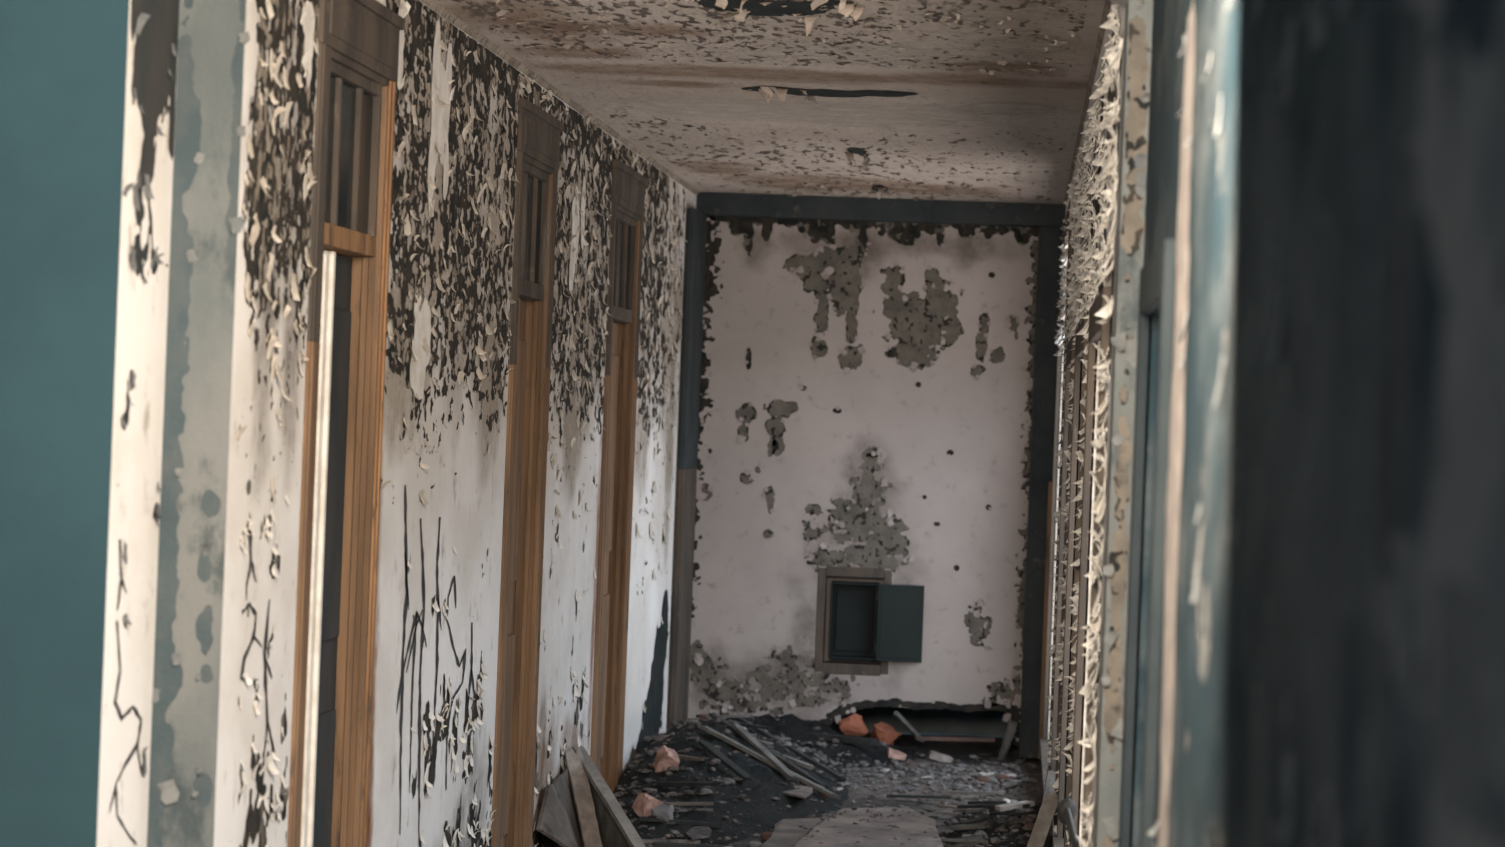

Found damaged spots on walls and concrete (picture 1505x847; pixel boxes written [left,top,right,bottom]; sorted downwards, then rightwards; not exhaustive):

crack [109,539,142,845]
peeling [121,0,213,847]
peeling [201,490,221,517]
crack [240,530,275,763]
peeling [231,673,289,847]
peeling [225,0,320,585]
crack [396,485,475,846]
peeling [384,0,1152,847]